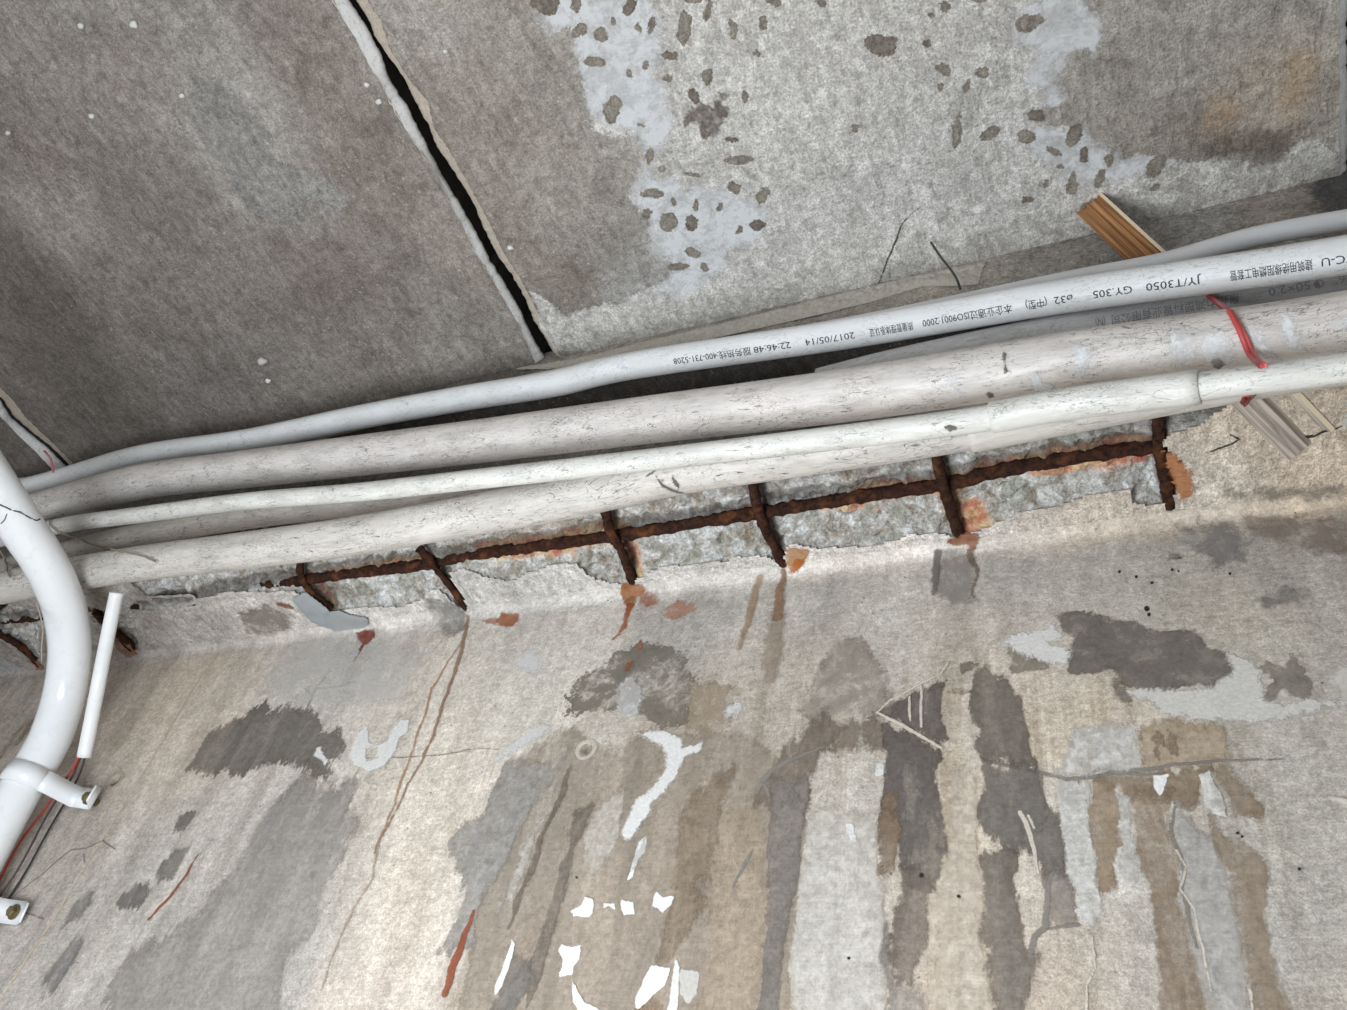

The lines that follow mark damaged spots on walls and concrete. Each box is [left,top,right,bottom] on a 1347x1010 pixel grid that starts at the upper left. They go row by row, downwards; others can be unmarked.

spalling [0,602,46,668]
rust [612,583,694,640]
spalling [86,404,1237,657]
rust [737,548,809,681]
rust [931,533,980,603]
rust [1161,450,1194,500]
leakage [103,699,409,1010]
leakage [436,611,1347,1010]
crack [981,758,1283,1010]